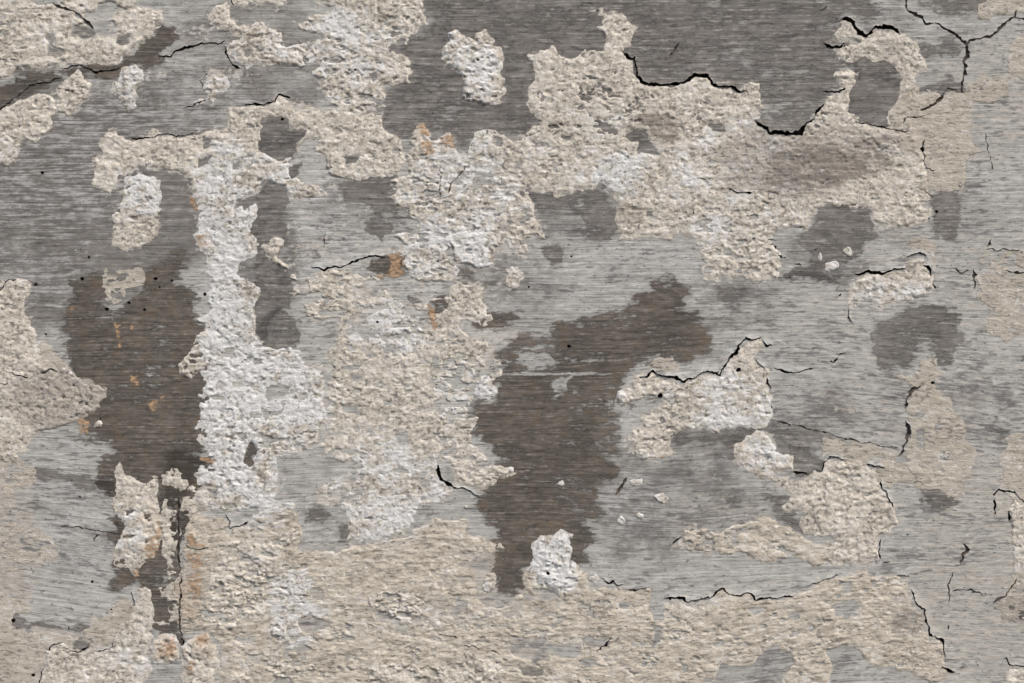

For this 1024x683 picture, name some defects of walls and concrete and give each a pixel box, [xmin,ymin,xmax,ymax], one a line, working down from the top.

crack [159,41,240,69]
crack [624,53,746,93]
flaking render [390,8,1009,283]
crack [755,88,845,136]
crack [821,0,1024,196]
flaking render [91,0,516,542]
flaking render [113,461,182,580]
crack [436,464,478,496]
crack [640,336,921,507]
flaking render [0,498,947,683]
crack [602,575,837,603]
crack [878,539,1016,673]